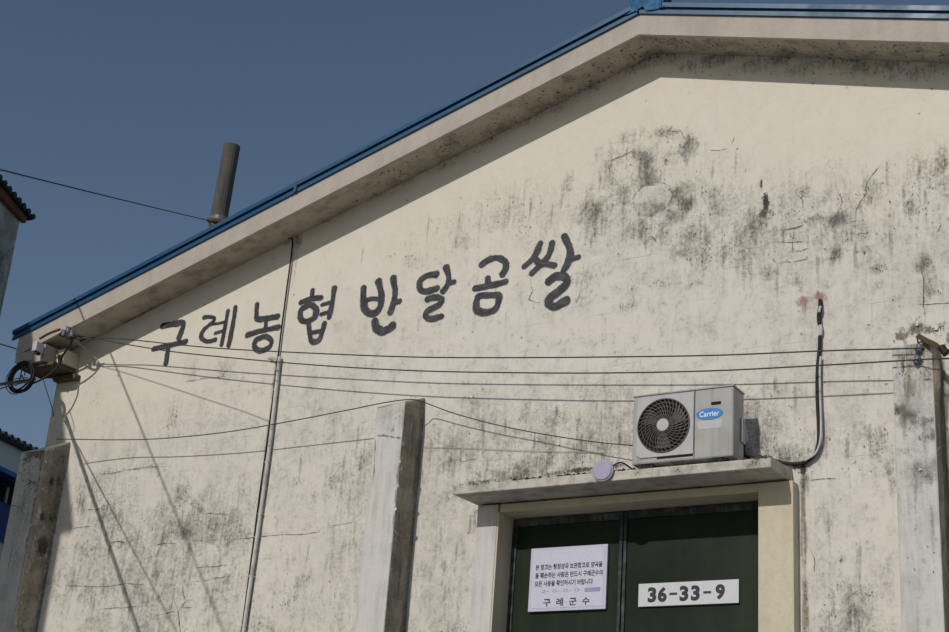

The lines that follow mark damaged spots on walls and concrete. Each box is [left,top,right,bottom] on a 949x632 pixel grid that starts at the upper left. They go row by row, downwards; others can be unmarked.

damp [557,37,947,102]
damp [633,127,698,187]
damp [581,202,604,236]
damp [638,185,693,241]